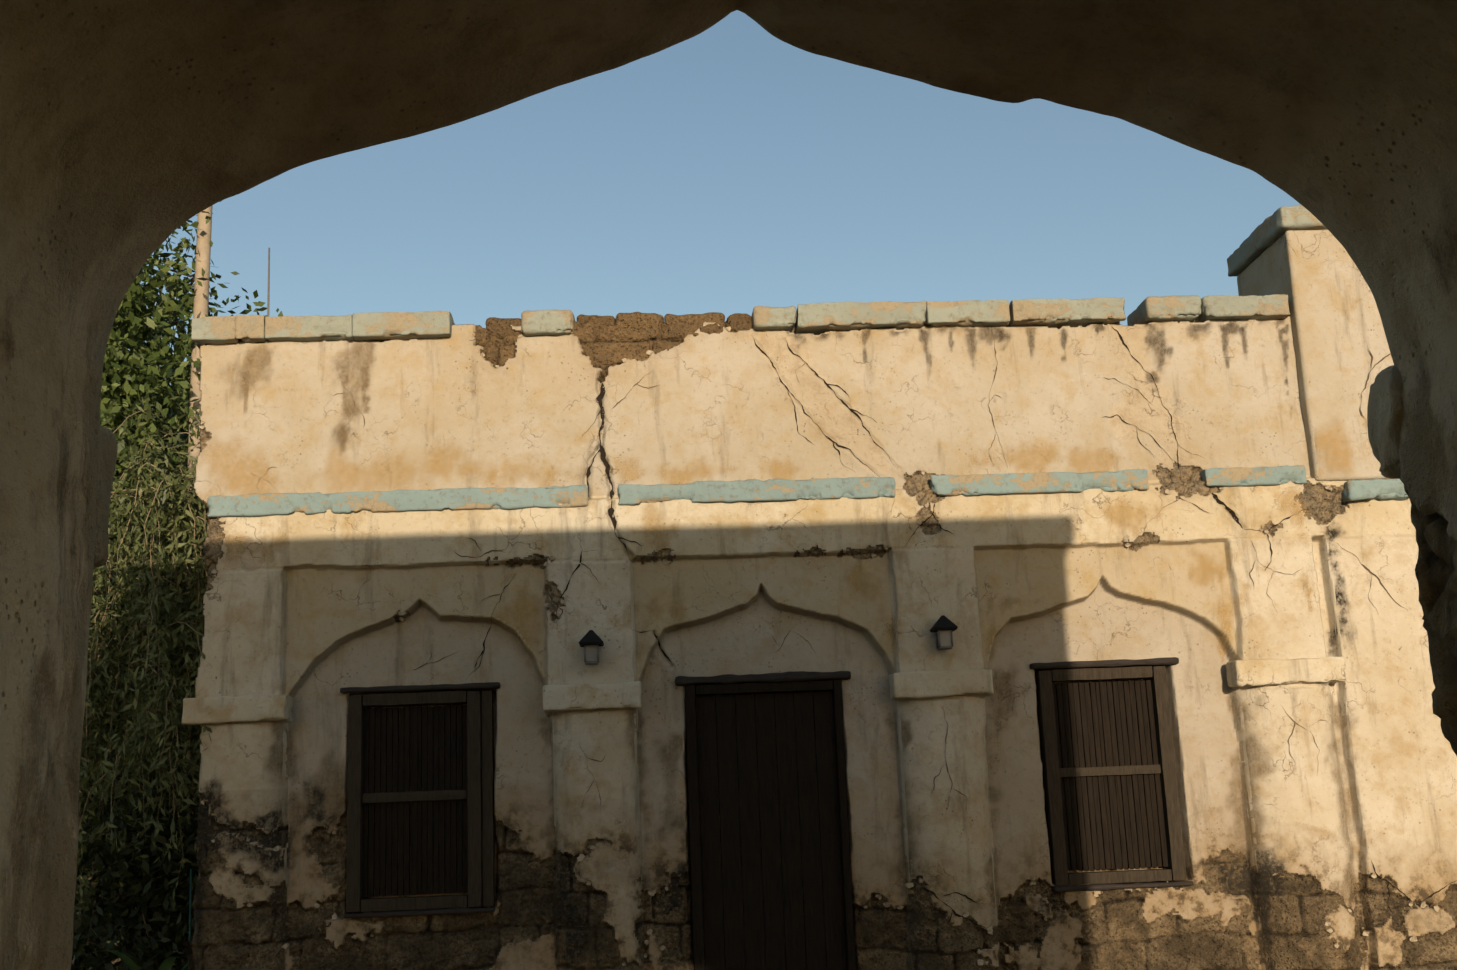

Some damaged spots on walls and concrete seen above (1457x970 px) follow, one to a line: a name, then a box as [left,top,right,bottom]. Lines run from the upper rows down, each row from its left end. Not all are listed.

spalling [469,317,523,369]
crack [582,380,655,552]
spalling [574,312,753,383]
crack [753,338,890,477]
crack [1101,327,1305,611]
spalling [1293,480,1354,525]
crack [414,538,515,675]
crack [546,552,598,621]
crack [634,630,673,665]
spalling [1405,490,1457,756]
spalling [187,791,694,970]
spalling [852,848,1457,970]